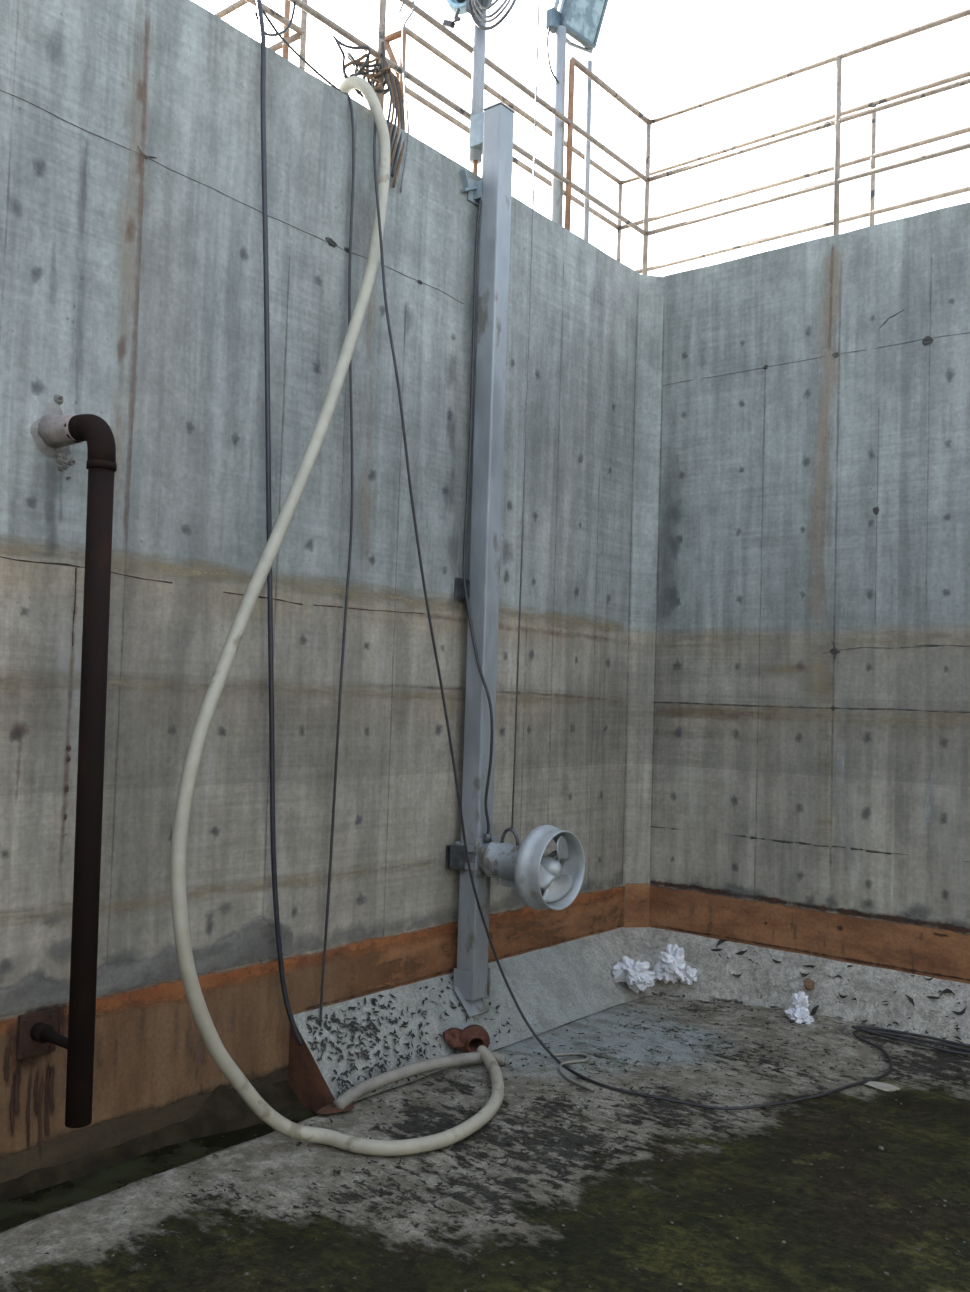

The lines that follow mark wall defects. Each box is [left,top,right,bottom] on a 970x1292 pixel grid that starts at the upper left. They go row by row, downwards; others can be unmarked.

corrosion [488,881,970,984]
corrosion [0,922,458,1156]
leakage [248,1066,289,1089]
leakage [0,1084,234,1183]